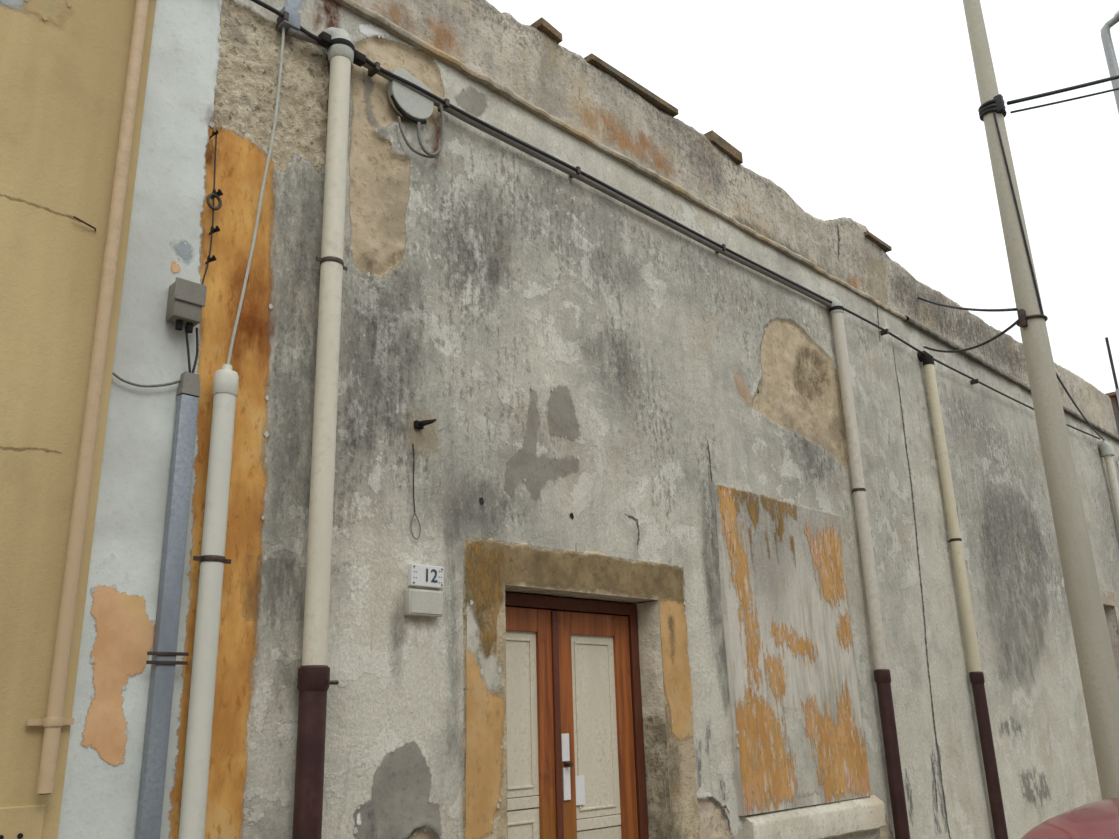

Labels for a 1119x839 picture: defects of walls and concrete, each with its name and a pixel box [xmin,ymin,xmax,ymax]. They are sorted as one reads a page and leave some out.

crack [1,195,80,222]
spalling [349,34,487,279]
peeling [168,0,329,839]
spalling [735,319,849,469]
peeling [81,584,156,767]
peeling [353,741,442,839]
peeling [466,600,505,839]
peeling [659,599,694,741]
peeling [718,484,871,815]
crack [876,305,951,839]